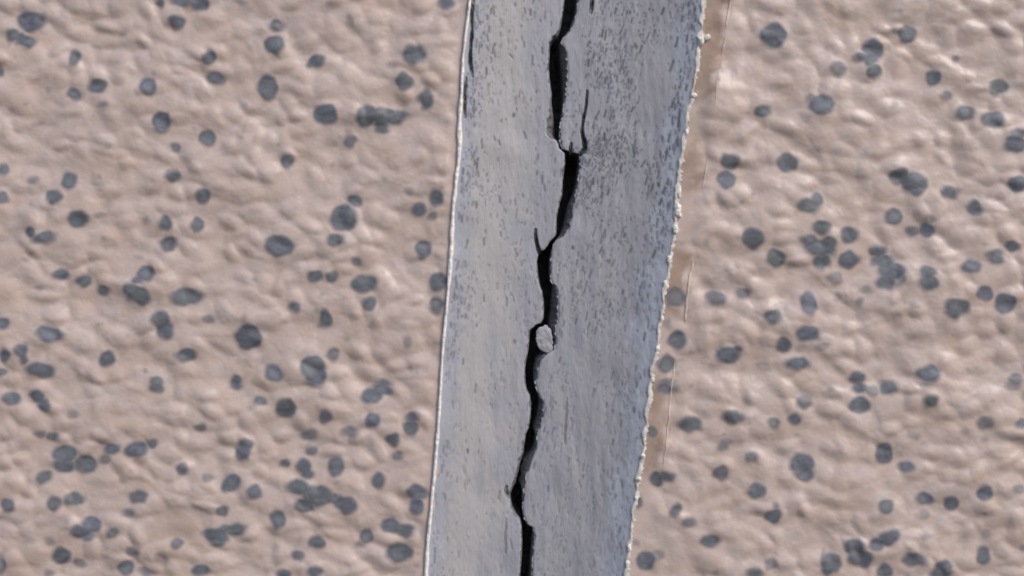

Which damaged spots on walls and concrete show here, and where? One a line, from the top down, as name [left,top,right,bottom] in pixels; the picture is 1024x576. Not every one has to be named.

crack [504,0,594,576]